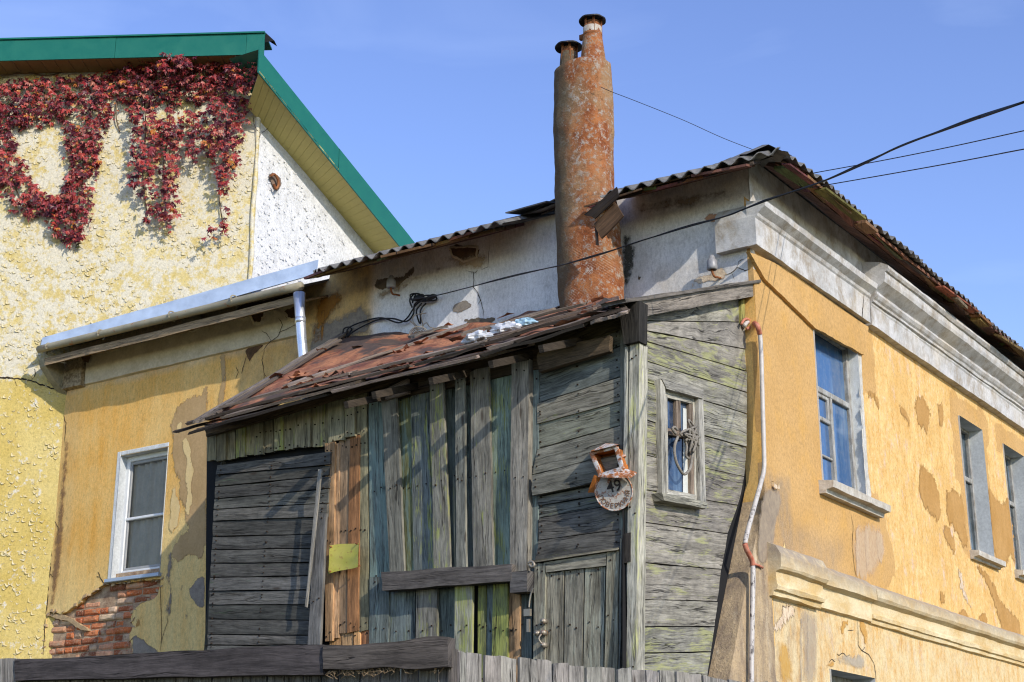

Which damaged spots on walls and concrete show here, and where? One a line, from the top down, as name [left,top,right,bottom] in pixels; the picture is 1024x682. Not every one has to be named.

flaking render [375,267,414,290]
water stain [623,236,635,284]
corrosion [313,293,342,342]
water stain [311,306,370,350]
crack [0,372,54,389]
flaking render [0,100,352,659]
peeling [899,396,944,433]
peeling [919,464,968,555]
peeling [854,524,884,579]